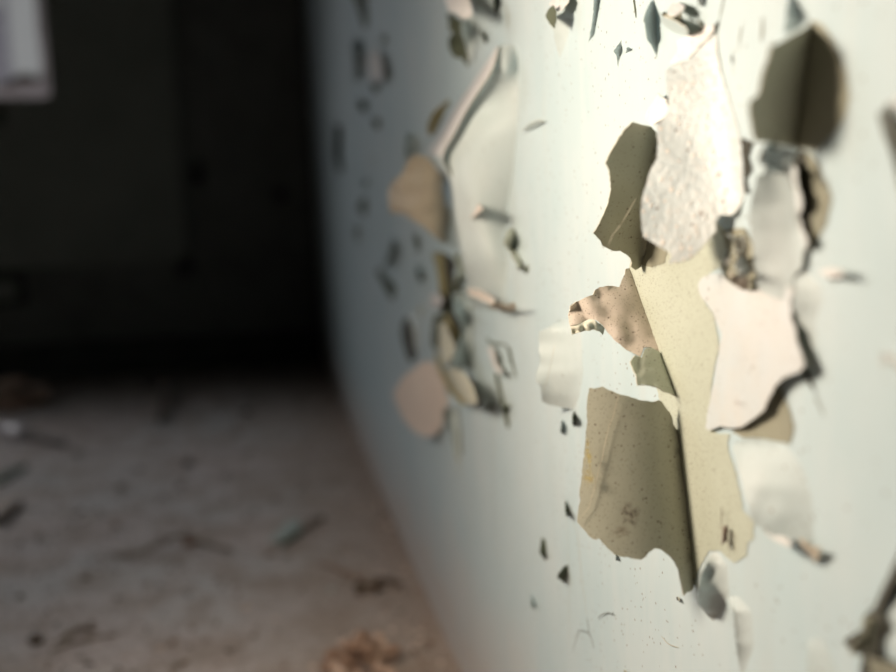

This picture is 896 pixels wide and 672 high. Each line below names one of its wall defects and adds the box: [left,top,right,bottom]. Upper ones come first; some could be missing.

peeling [428,99,450,136]
peeling [521,119,544,131]
peeling [388,130,516,437]
peeling [536,0,849,672]